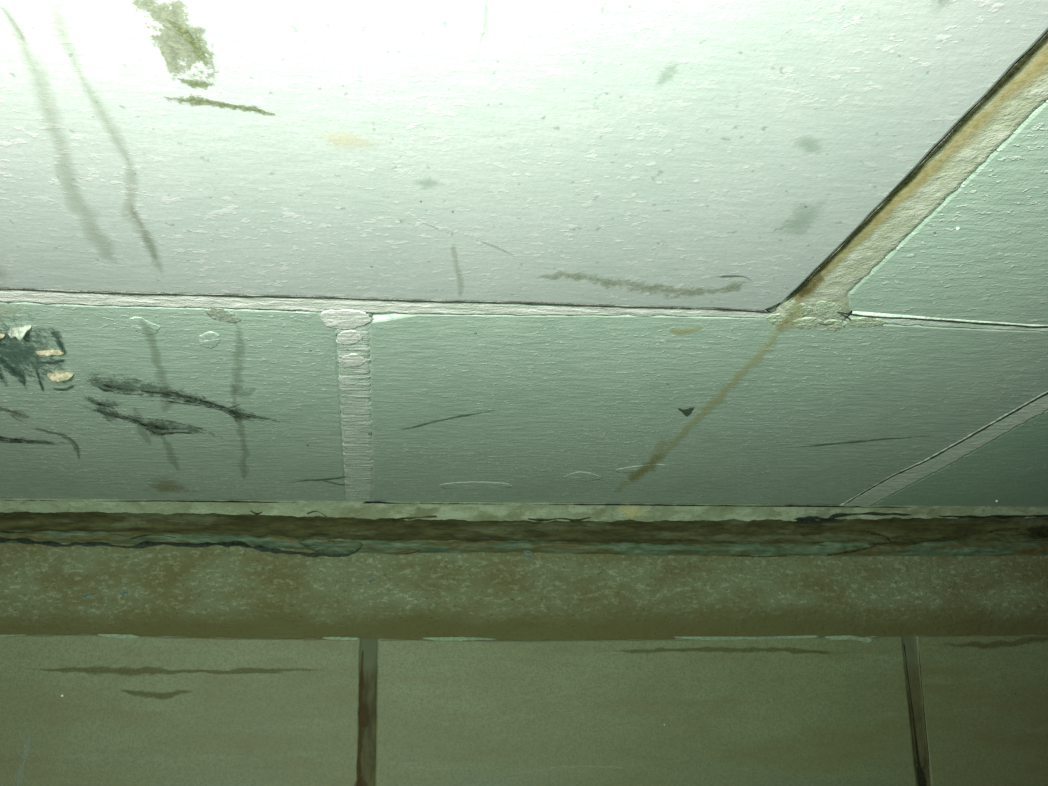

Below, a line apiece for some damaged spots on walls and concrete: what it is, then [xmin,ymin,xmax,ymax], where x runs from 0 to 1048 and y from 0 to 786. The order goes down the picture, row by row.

leakage [0,321,75,391]
leakage [85,373,280,436]